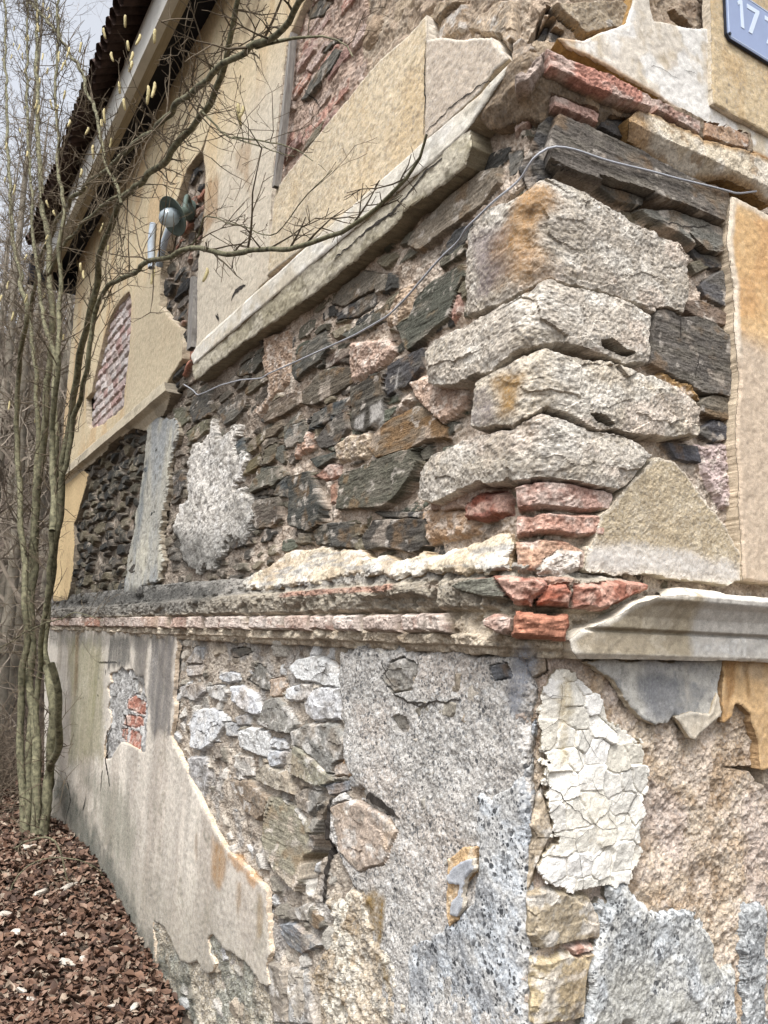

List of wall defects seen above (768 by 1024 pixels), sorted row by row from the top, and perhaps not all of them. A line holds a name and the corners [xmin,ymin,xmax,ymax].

damp [51,631,174,734]
flaking render [96,657,154,761]
flaking render [153,638,392,1024]
flaking render [394,673,480,742]
crack [541,684,638,887]
flaking render [515,650,768,1024]